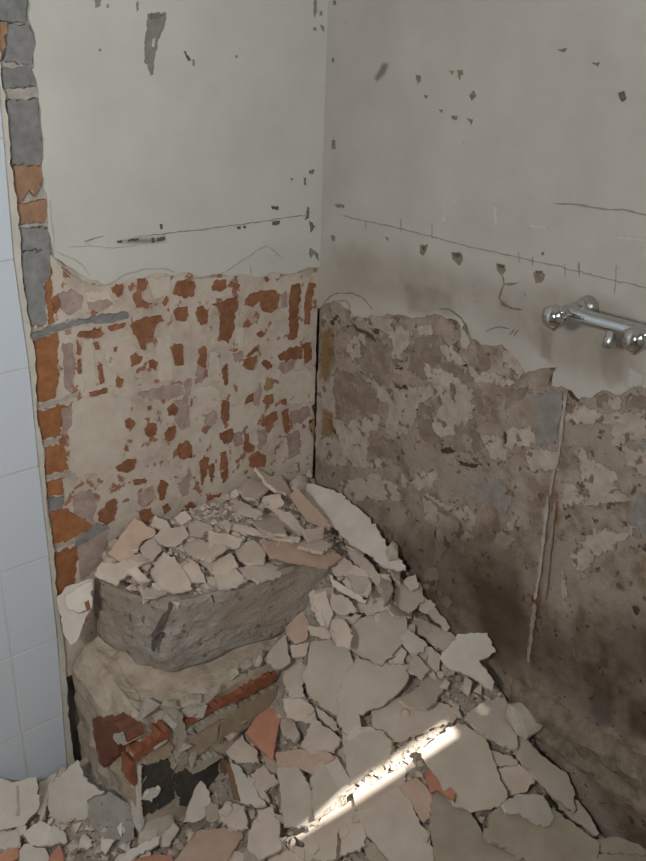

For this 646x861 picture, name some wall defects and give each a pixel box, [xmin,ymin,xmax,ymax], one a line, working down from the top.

flaking render [0,0,78,327]
peeling [136,1,167,76]
flaking render [30,255,646,849]